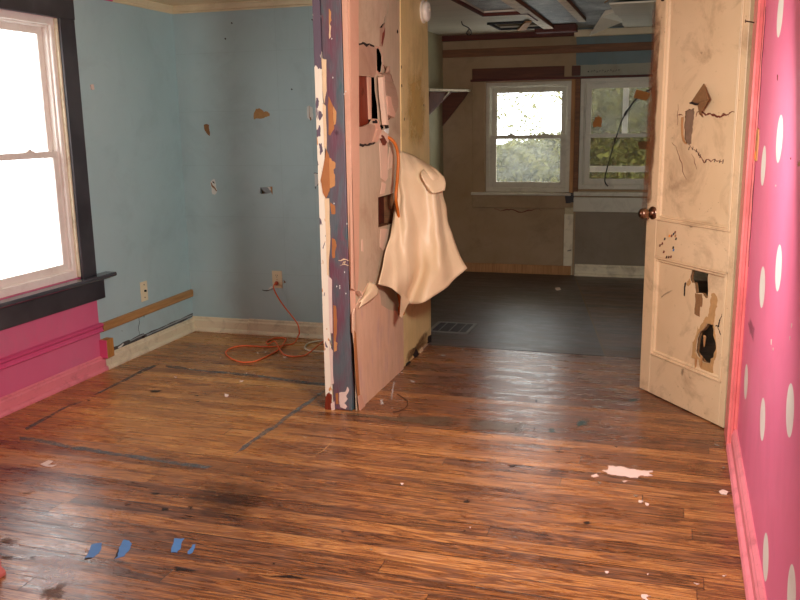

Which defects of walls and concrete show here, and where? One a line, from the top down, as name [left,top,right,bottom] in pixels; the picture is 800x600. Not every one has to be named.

peeling [254,108,270,119]
crack [679,110,734,118]
peeling [348,0,383,296]
peeling [379,143,393,194]
crack [688,146,724,164]
peeling [321,58,355,410]
spalling [691,293,718,373]